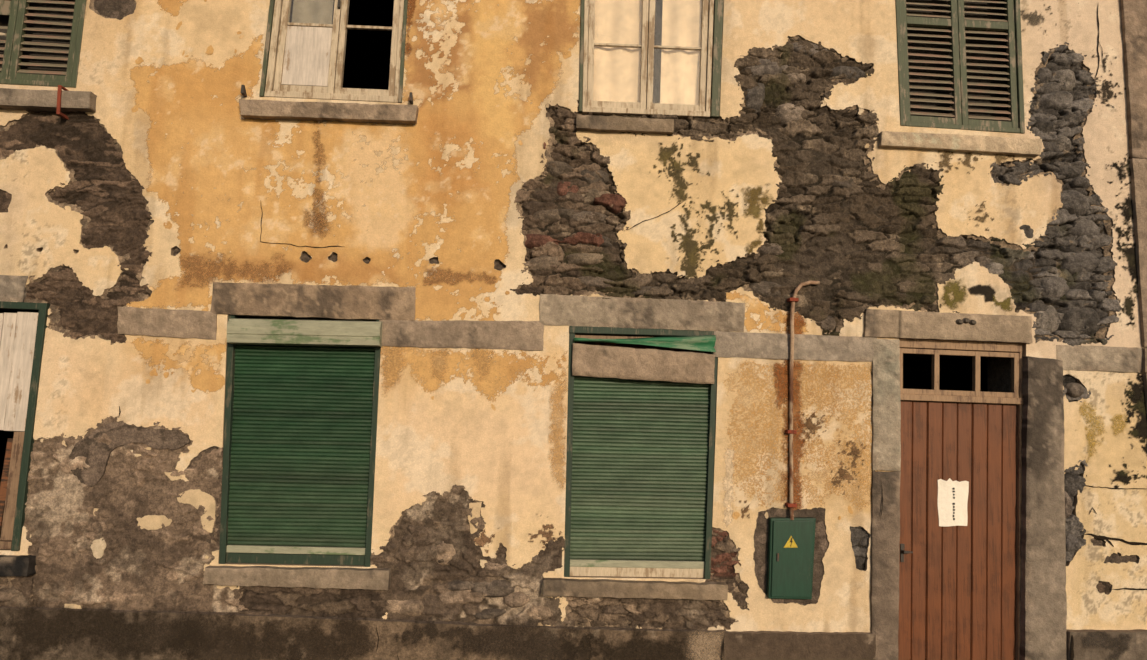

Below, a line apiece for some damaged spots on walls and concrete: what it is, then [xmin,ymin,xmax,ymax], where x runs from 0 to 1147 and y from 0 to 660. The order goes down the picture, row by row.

flaking render [0,0,1122,393]
rust [785,312,806,334]
flaking render [0,416,760,630]
peeling [381,346,568,411]
rust [774,359,805,511]
peeling [723,360,882,570]
flaking render [1063,374,1091,402]
flaking render [1064,460,1138,564]
water stain [0,600,375,660]